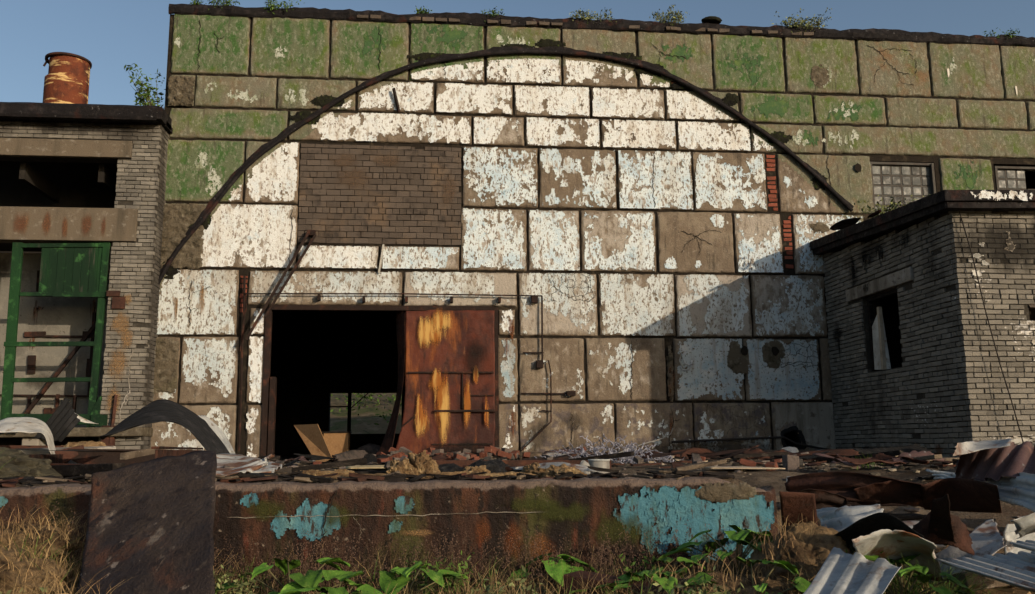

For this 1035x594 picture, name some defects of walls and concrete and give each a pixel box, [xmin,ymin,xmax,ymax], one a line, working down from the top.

peeling [151,34,863,471]
rust [418,311,452,345]
rust [416,369,449,440]
rust [464,369,478,424]
peeling [613,482,775,563]